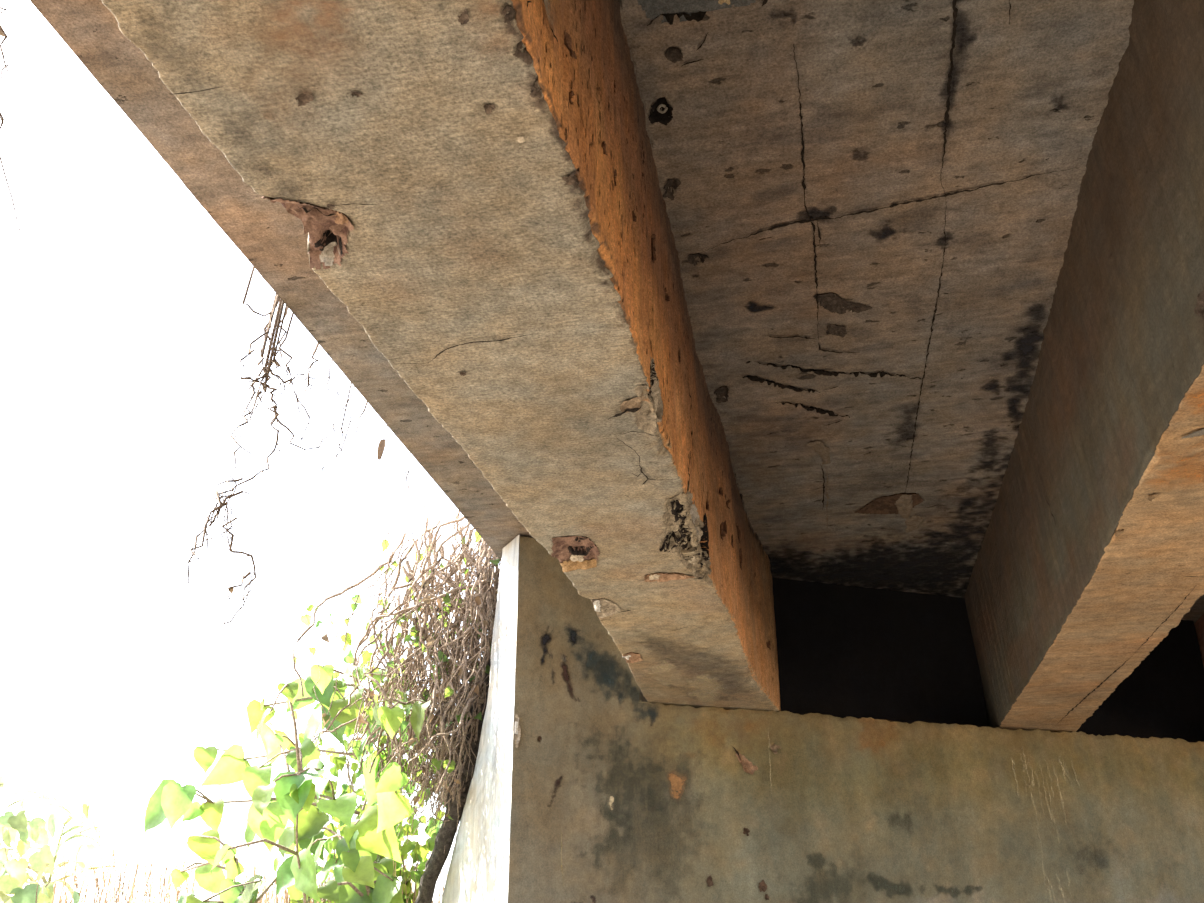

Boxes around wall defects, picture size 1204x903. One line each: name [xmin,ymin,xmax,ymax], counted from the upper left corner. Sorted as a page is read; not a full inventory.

spalling [261,196,354,270]
crack [700,169,1069,253]
spalling [608,352,663,434]
crack [737,335,922,426]
spalling [551,536,600,572]
spalling [644,460,771,586]
leakage [541,627,656,725]
crack [1056,576,1196,725]
leakage [868,874,911,897]
leakage [936,885,980,897]